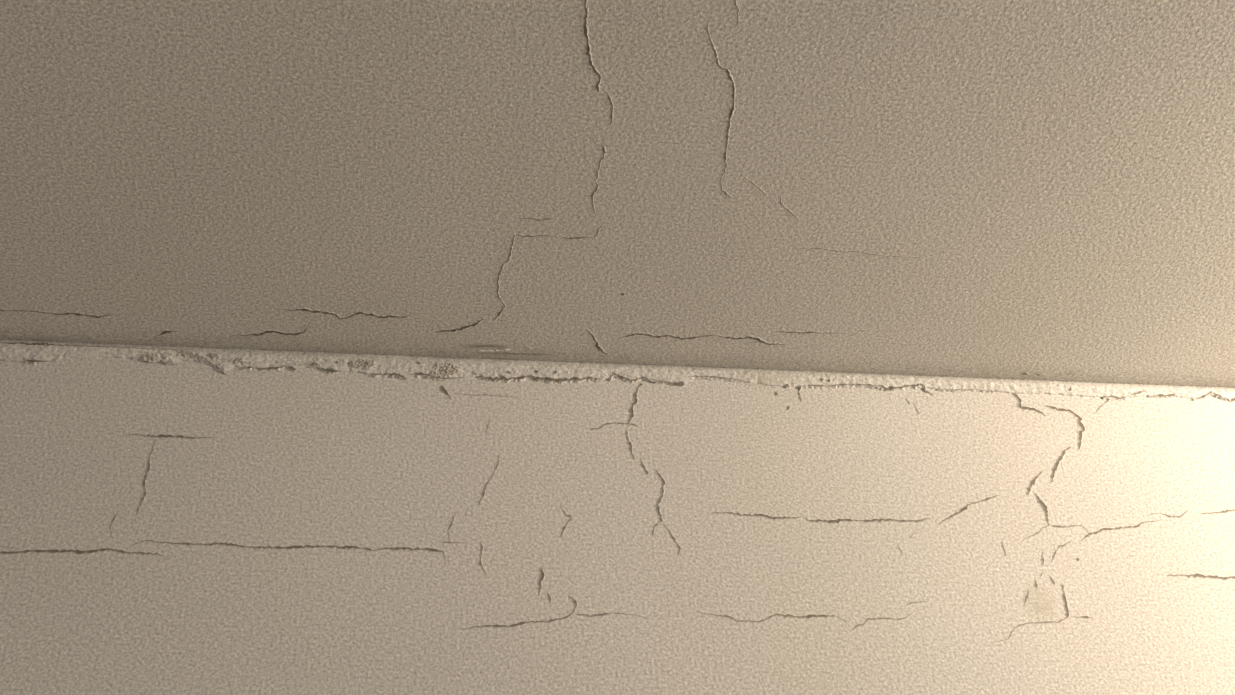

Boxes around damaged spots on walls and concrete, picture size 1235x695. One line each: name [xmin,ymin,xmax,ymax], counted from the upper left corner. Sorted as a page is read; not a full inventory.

crack [436,0,614,333]
crack [706,0,921,258]
crack [0,307,411,375]
crack [0,329,918,576]
crack [462,566,652,630]
crack [697,383,1235,643]